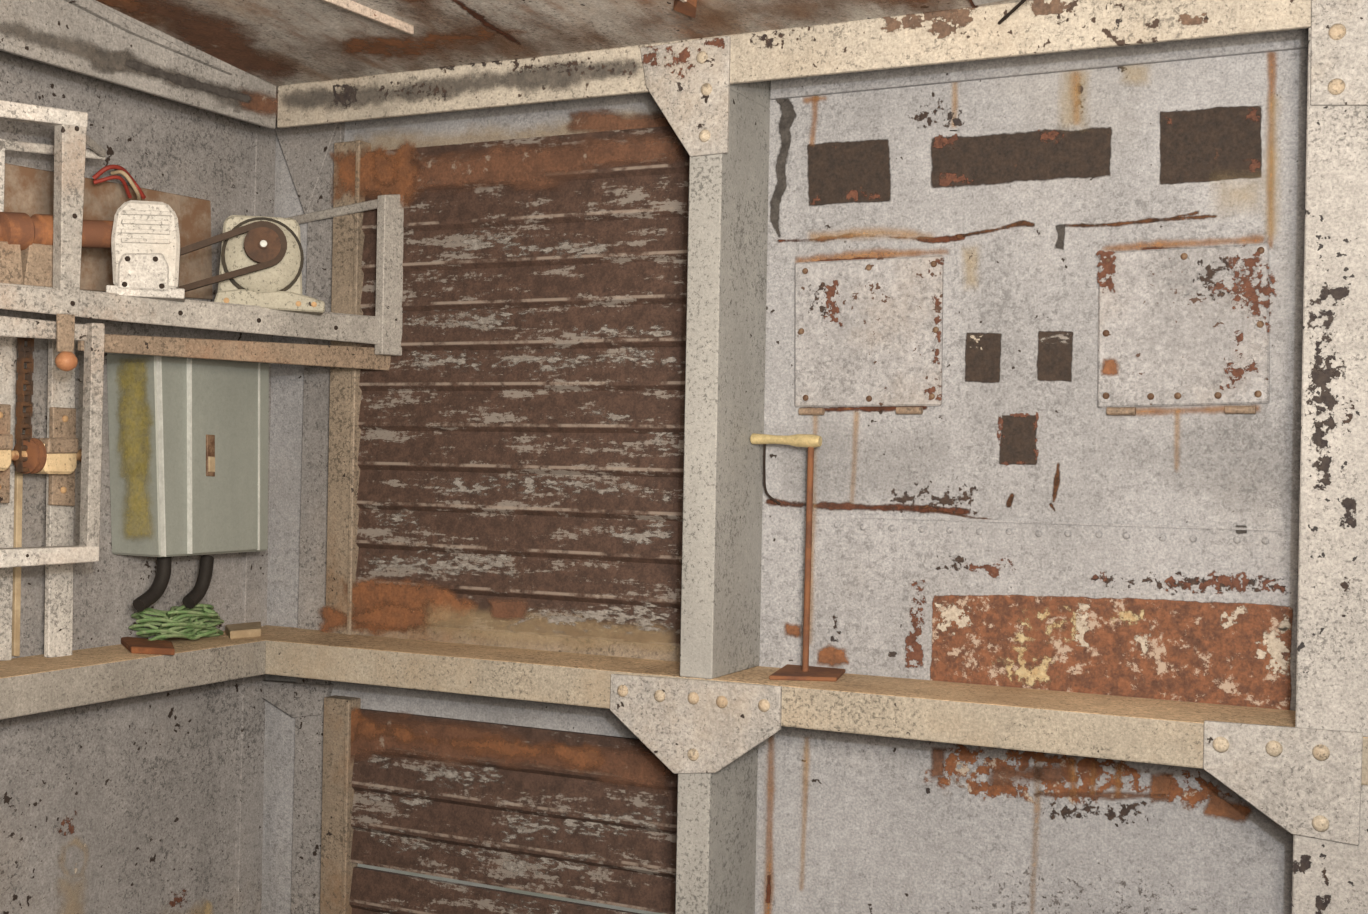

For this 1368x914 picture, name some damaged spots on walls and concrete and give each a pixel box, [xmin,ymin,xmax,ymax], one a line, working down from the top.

peeling [881,7,975,39]
peeling [1031,0,1072,24]
rust [798,251,926,263]
peeling [408,325,676,371]
peeling [1305,282,1355,490]
rust [805,406,927,433]
peeling [1340,497,1357,529]
rust [320,579,526,635]
rust [930,595,1293,710]
rust [924,744,1251,824]
peeling [448,806,664,876]
peeling [1293,855,1331,914]